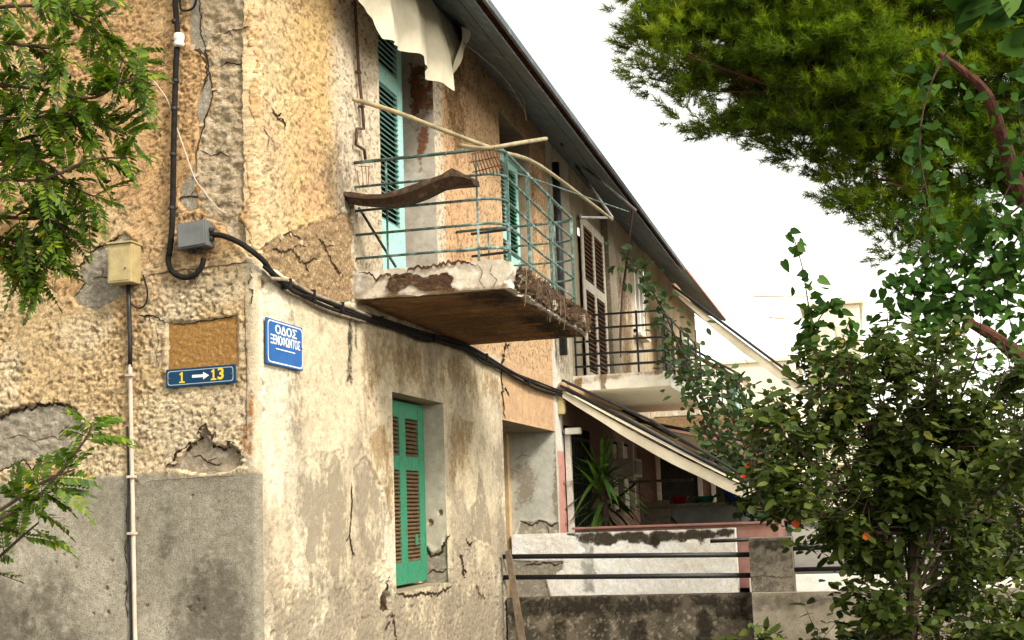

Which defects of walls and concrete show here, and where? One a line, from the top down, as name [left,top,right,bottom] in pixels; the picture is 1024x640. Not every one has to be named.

flaking render [181,0,476,304]
flaking render [73,234,133,310]
crack [146,234,344,434]
crack [501,342,511,419]
flaking render [0,399,85,472]
flaking render [166,423,241,474]
crack [346,482,355,558]
water stain [567,528,735,548]
crack [381,538,485,640]